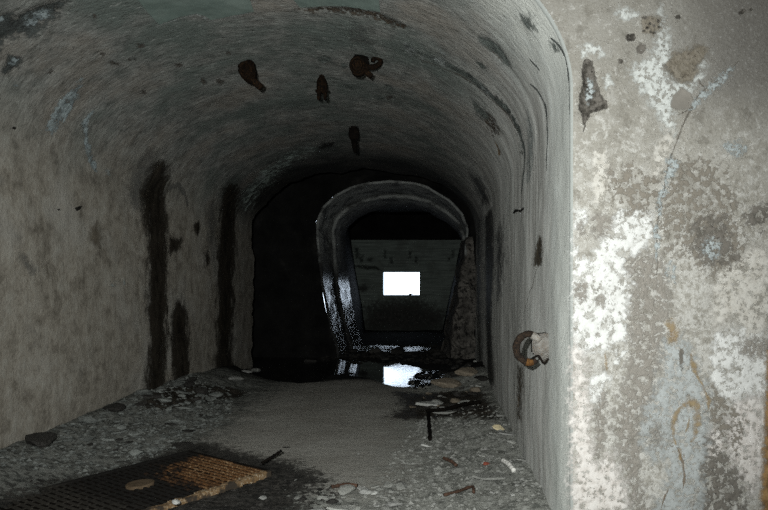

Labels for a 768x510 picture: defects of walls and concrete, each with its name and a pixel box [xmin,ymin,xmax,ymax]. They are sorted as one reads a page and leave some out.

spalling [578,43,614,132]
peeling [614,6,709,184]
water stain [131,152,247,410]
water stain [194,142,335,367]
water stain [605,155,768,283]
water stain [638,338,749,510]
water stain [738,337,768,359]